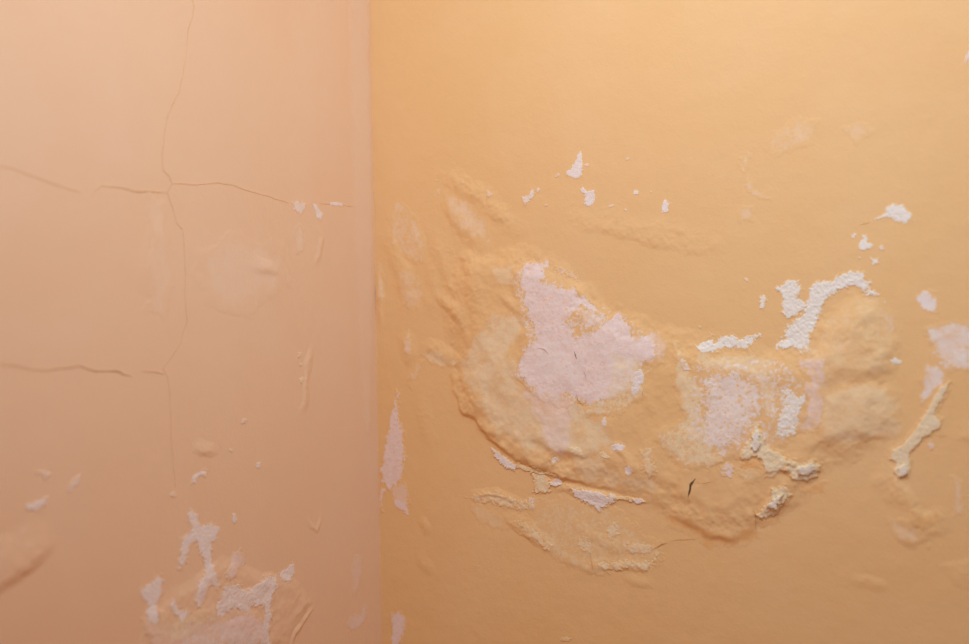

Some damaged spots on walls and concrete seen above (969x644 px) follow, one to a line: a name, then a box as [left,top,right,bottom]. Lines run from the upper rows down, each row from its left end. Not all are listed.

crack [0,0,287,413]
peeling [555,151,598,210]
peeling [850,233,885,266]
flaking render [379,388,411,516]
flaking render [465,252,694,580]
flaking render [598,353,825,521]
peeling [886,288,969,481]
peeling [138,507,296,644]